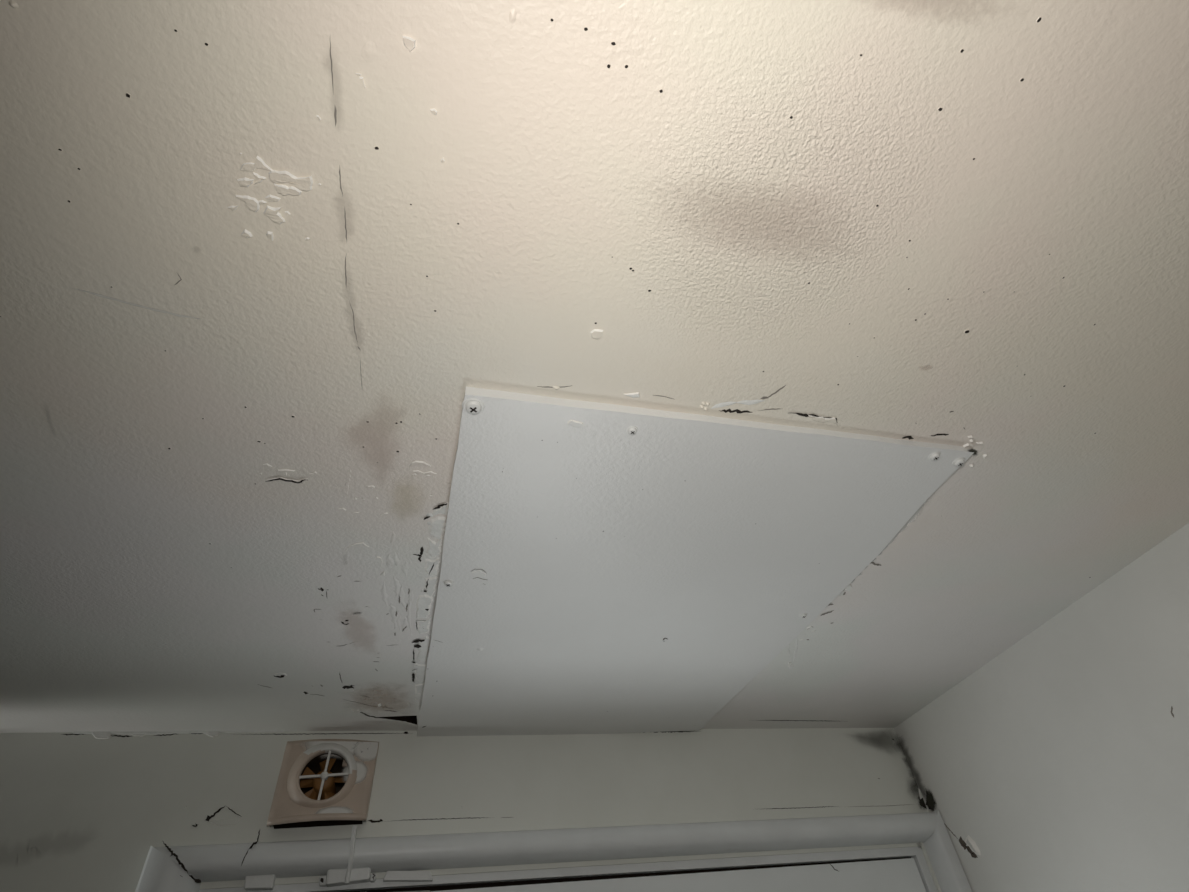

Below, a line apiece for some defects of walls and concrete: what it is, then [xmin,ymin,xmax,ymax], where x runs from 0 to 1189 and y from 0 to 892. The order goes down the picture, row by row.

crack [329,42,337,127]
peeling [228,152,321,241]
crack [339,165,363,392]
peeling [795,413,837,424]
flaking render [963,435,987,468]
peeling [254,463,317,484]
damp [918,788,936,812]
crack [163,841,201,883]